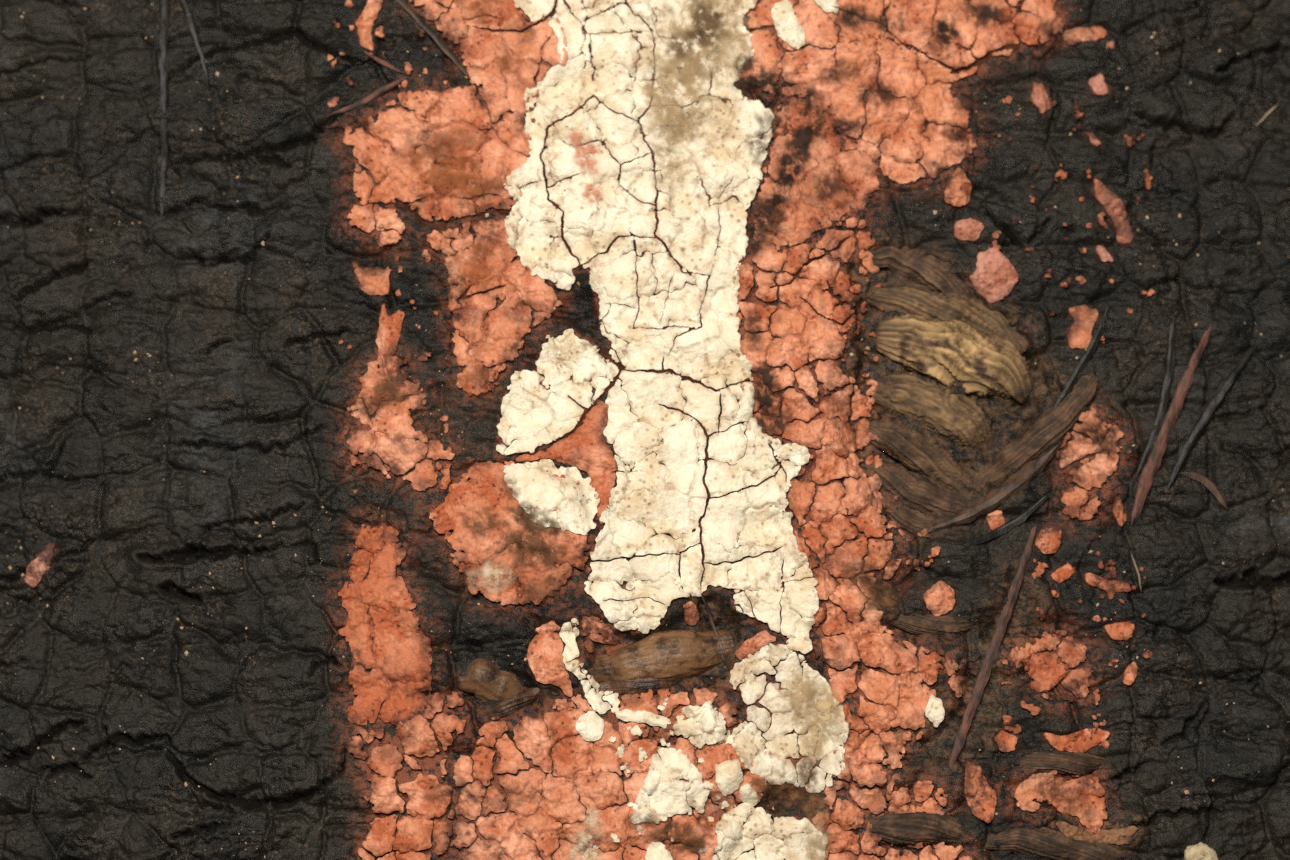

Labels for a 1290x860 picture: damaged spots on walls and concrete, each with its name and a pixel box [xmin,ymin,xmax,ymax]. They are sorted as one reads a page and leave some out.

peeling [327,52,354,87]
crack [841,0,1019,74]
crack [1005,0,1030,13]
crack [395,199,506,231]
crack [983,206,1051,249]
crack [437,0,814,625]
crack [770,236,855,326]
peeling [333,0,1153,860]